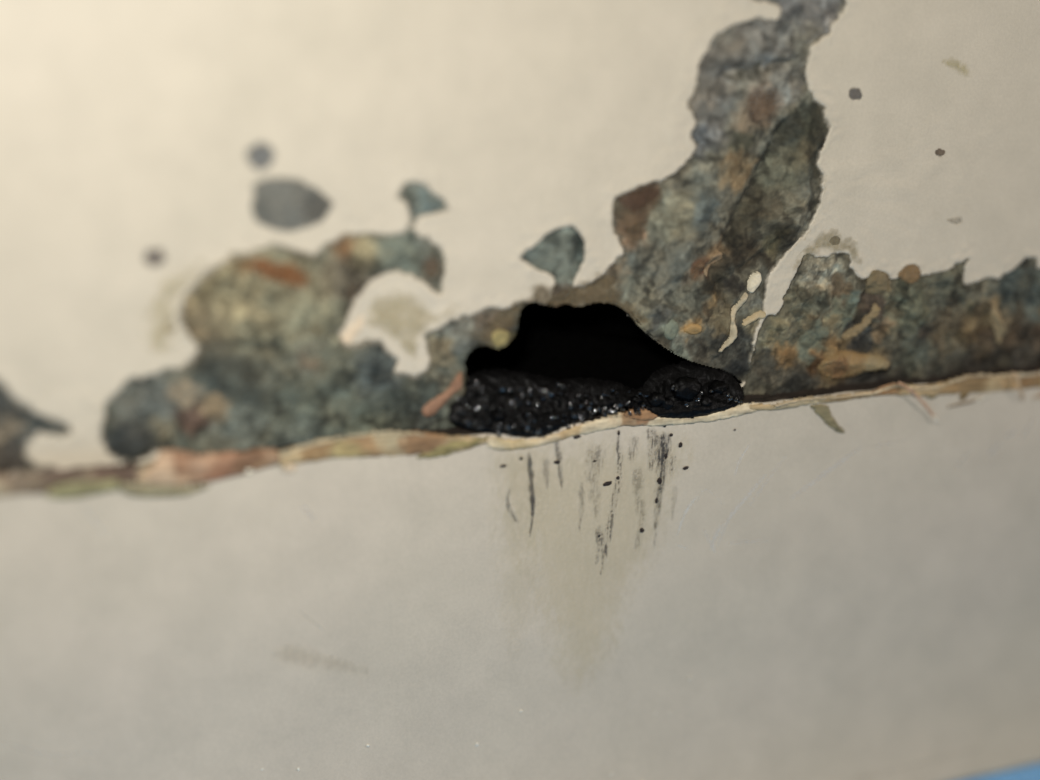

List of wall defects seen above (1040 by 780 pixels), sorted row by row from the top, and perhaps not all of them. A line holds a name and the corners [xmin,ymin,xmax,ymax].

corrosion [620,190,659,210]
spalling [0,0,1040,499]
water stain [482,277,646,346]
water stain [652,435,669,508]